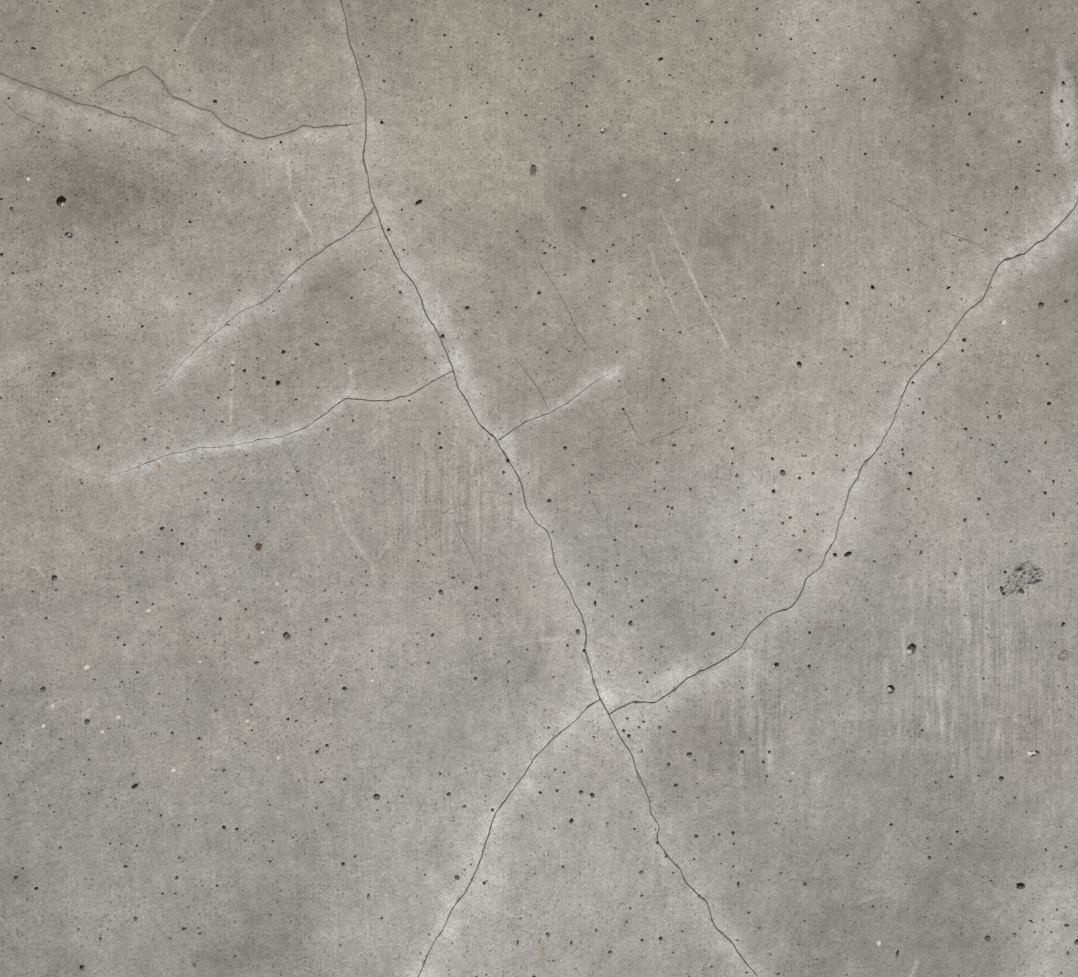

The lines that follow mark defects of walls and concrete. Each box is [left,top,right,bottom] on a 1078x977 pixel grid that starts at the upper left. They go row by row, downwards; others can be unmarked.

crack [0,73,179,136]
crack [93,66,351,140]
crack [159,318,233,388]
crack [63,446,224,478]
crack [231,0,1078,977]